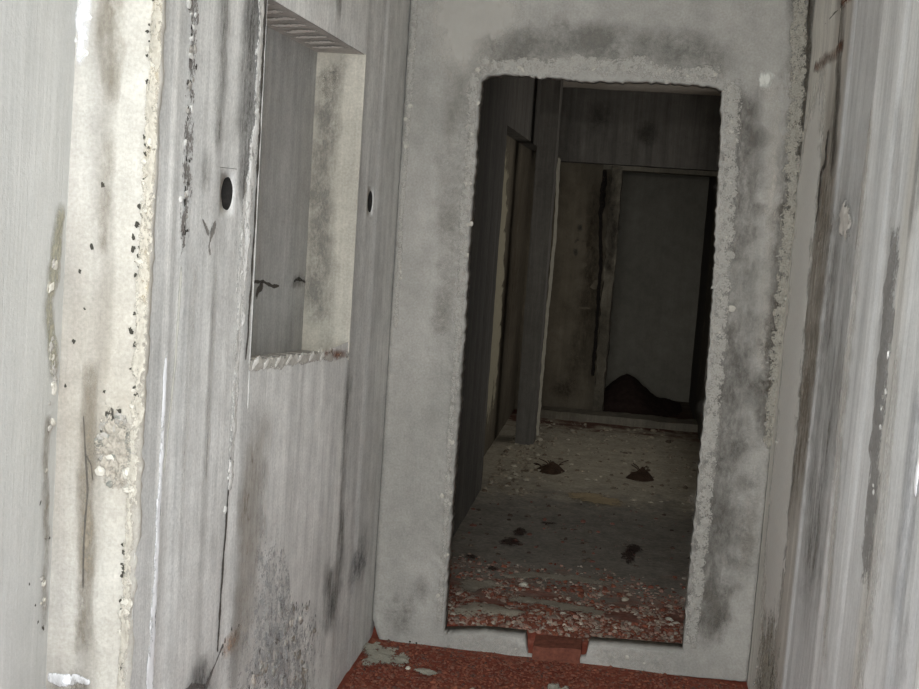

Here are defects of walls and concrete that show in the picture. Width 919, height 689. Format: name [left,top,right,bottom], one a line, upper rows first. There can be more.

damp [492,28,619,62]
damp [728,98,761,254]
damp [770,175,797,235]
spalling [94,0,163,689]
crack [187,0,306,689]
damp [714,326,750,418]
damp [758,297,784,427]
damp [698,486,731,628]